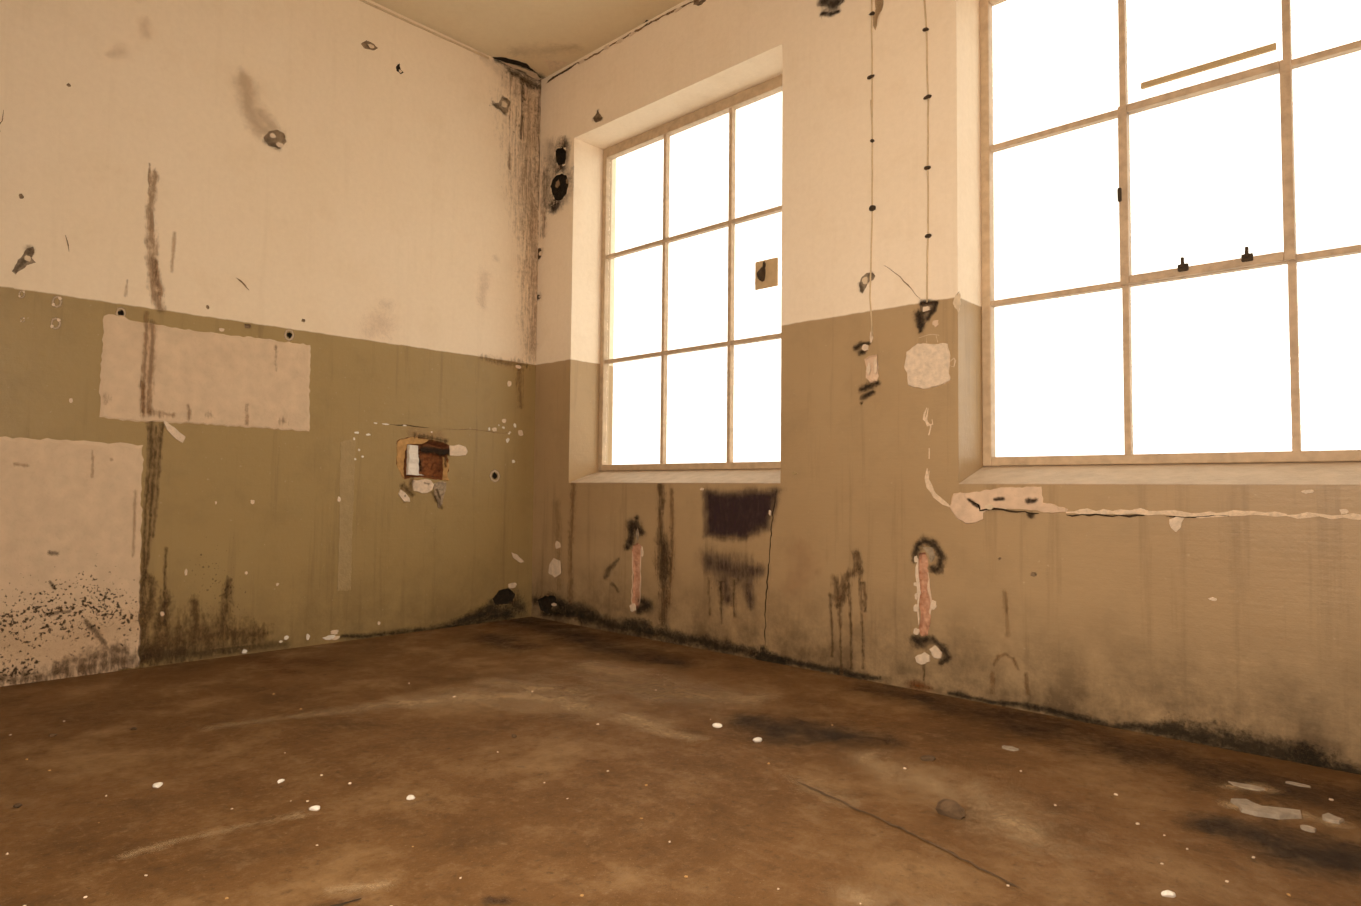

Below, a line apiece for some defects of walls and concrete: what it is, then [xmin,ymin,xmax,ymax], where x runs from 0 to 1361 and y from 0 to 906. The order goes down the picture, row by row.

leakage [495,59,545,281]
leakage [0,171,268,685]
leakage [317,483,890,763]
spalling [624,517,651,614]
spalling [912,538,951,680]